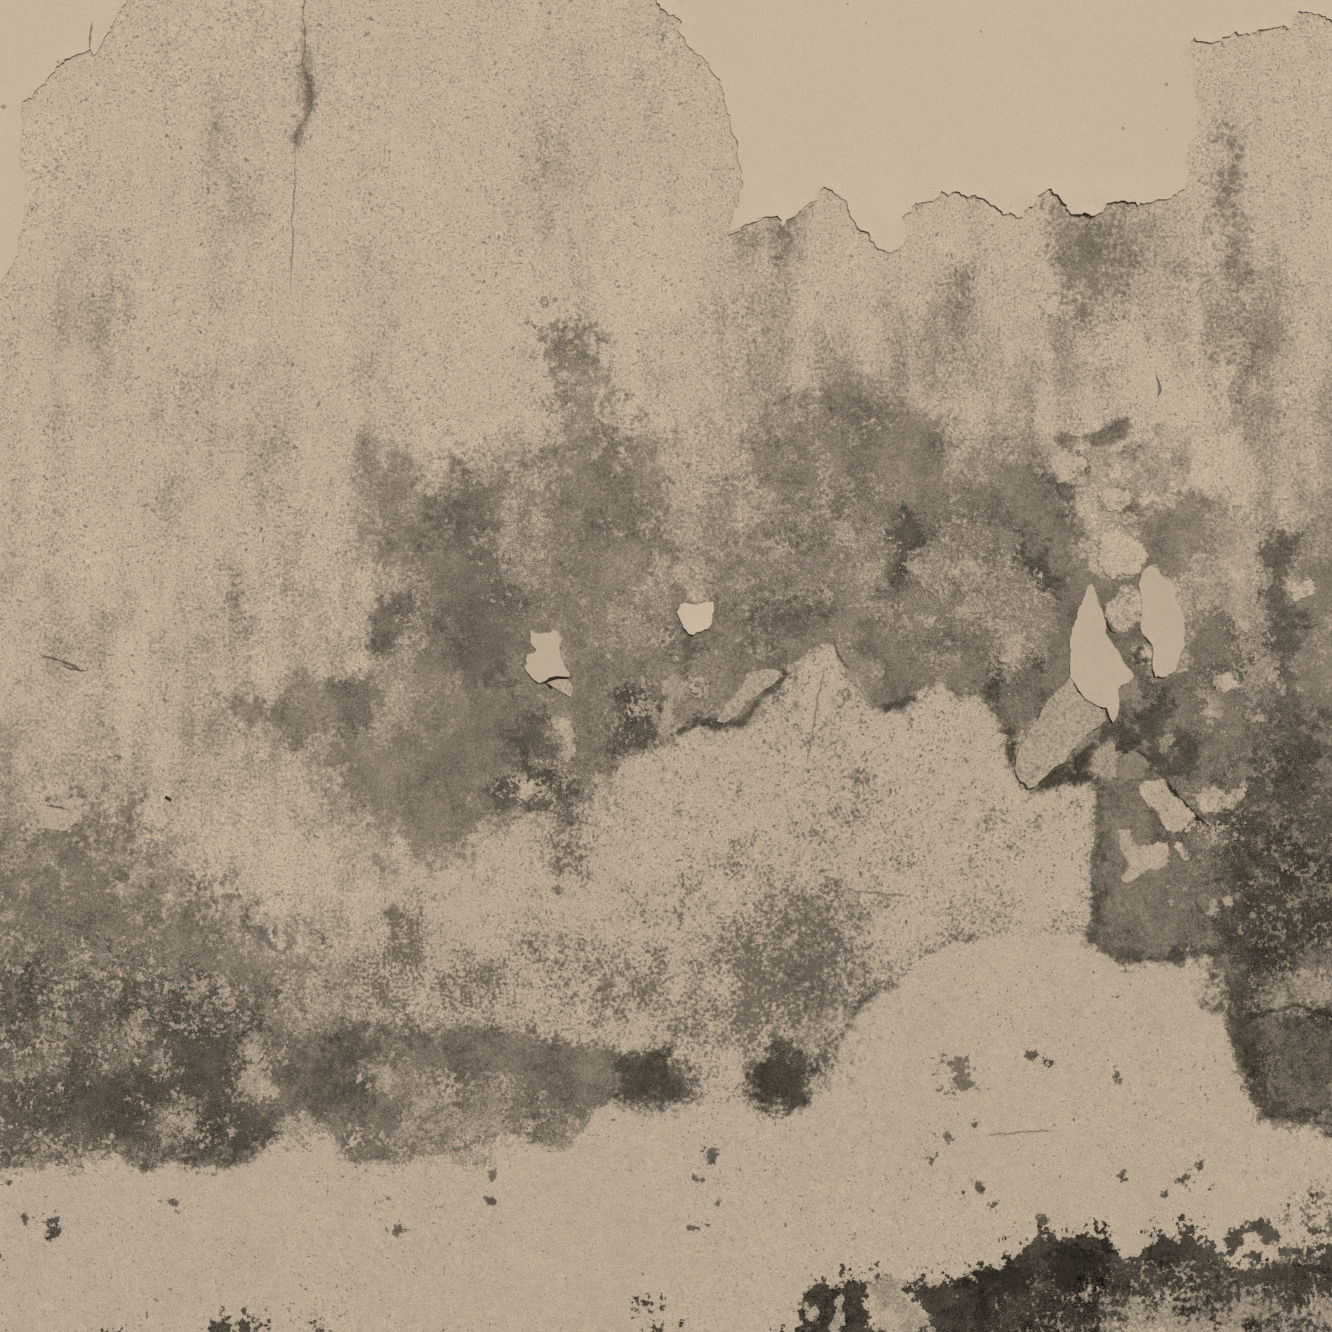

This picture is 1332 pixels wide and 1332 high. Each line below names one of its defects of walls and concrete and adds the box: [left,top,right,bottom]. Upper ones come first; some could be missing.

peeling [0,0,1332,450]
damp [217,297,1332,1138]
peeling [1138,565,1186,677]
damp [0,755,695,1180]
flaking render [0,584,1332,1332]
damp [1071,1164,1332,1332]